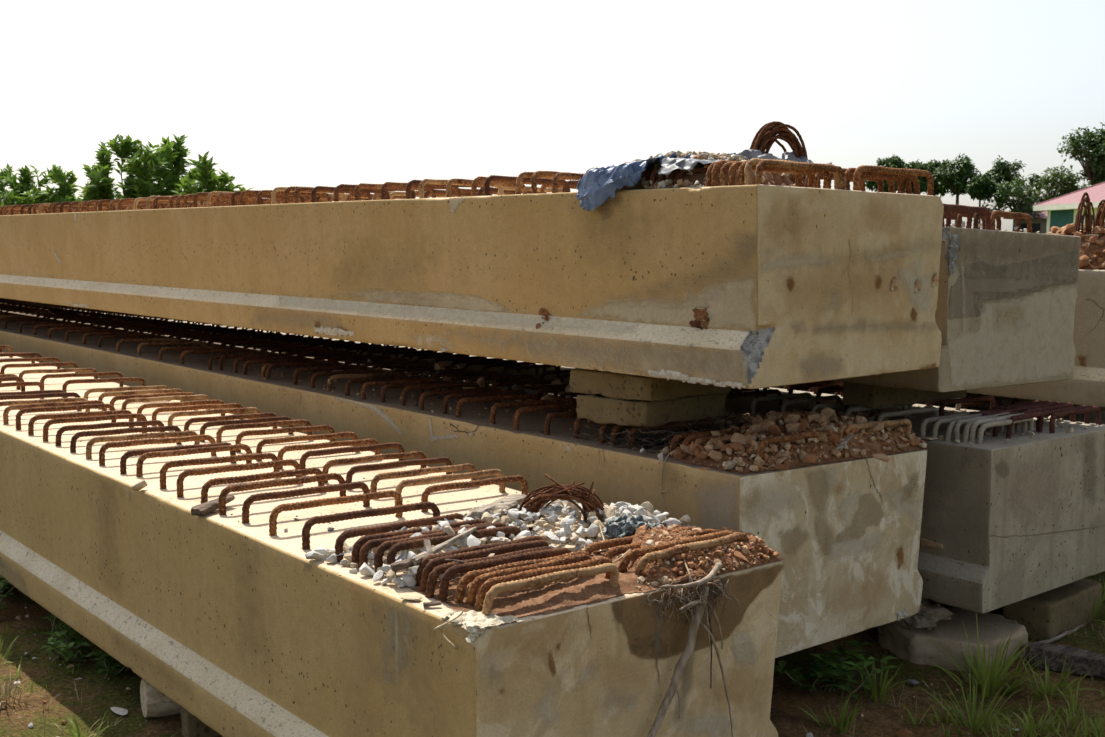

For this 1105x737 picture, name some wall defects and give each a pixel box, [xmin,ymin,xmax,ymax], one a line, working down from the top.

corrosion [689,303,710,330]
spalling [648,327,775,389]
spalling [442,610,524,647]